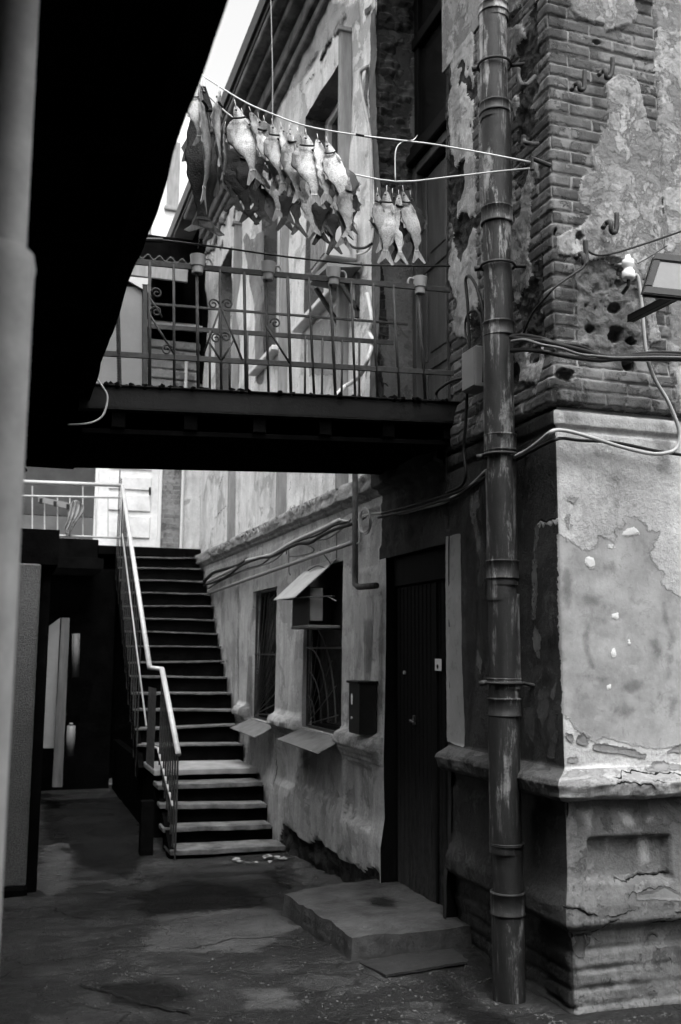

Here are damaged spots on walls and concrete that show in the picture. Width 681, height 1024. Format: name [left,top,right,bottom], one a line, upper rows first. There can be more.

spalling [448,223,484,451]
spalling [472,27,484,310]
spalling [507,0,677,425]
peeling [524,495,681,772]
crack [563,867,681,963]